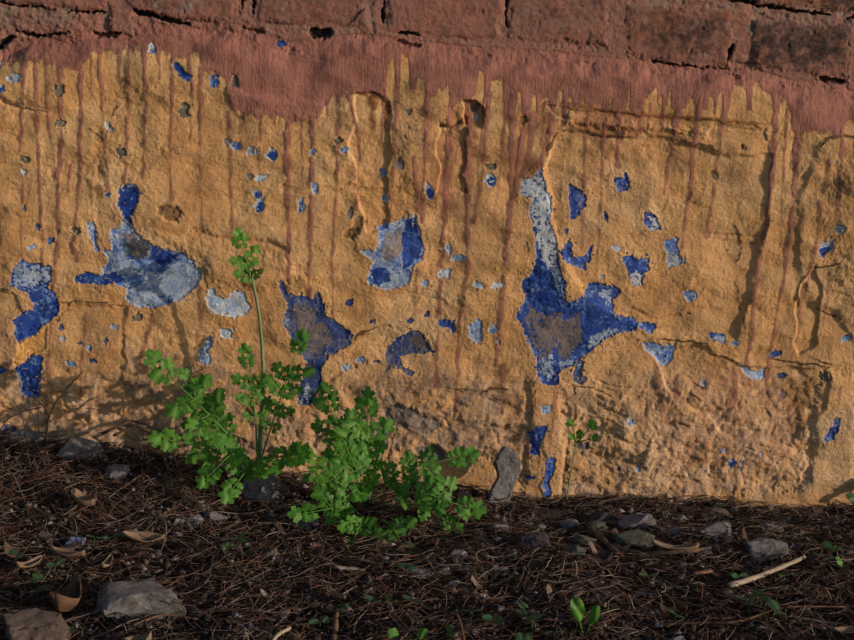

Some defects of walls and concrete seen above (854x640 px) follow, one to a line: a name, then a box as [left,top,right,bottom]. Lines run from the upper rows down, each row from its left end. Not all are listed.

peeling [0,354,44,399]
peeling [9,244,65,344]
peeling [75,184,251,365]
peeling [344,211,425,291]
peeling [275,280,500,406]
peeling [421,243,467,287]
peeling [516,167,677,386]
peeling [663,237,685,269]